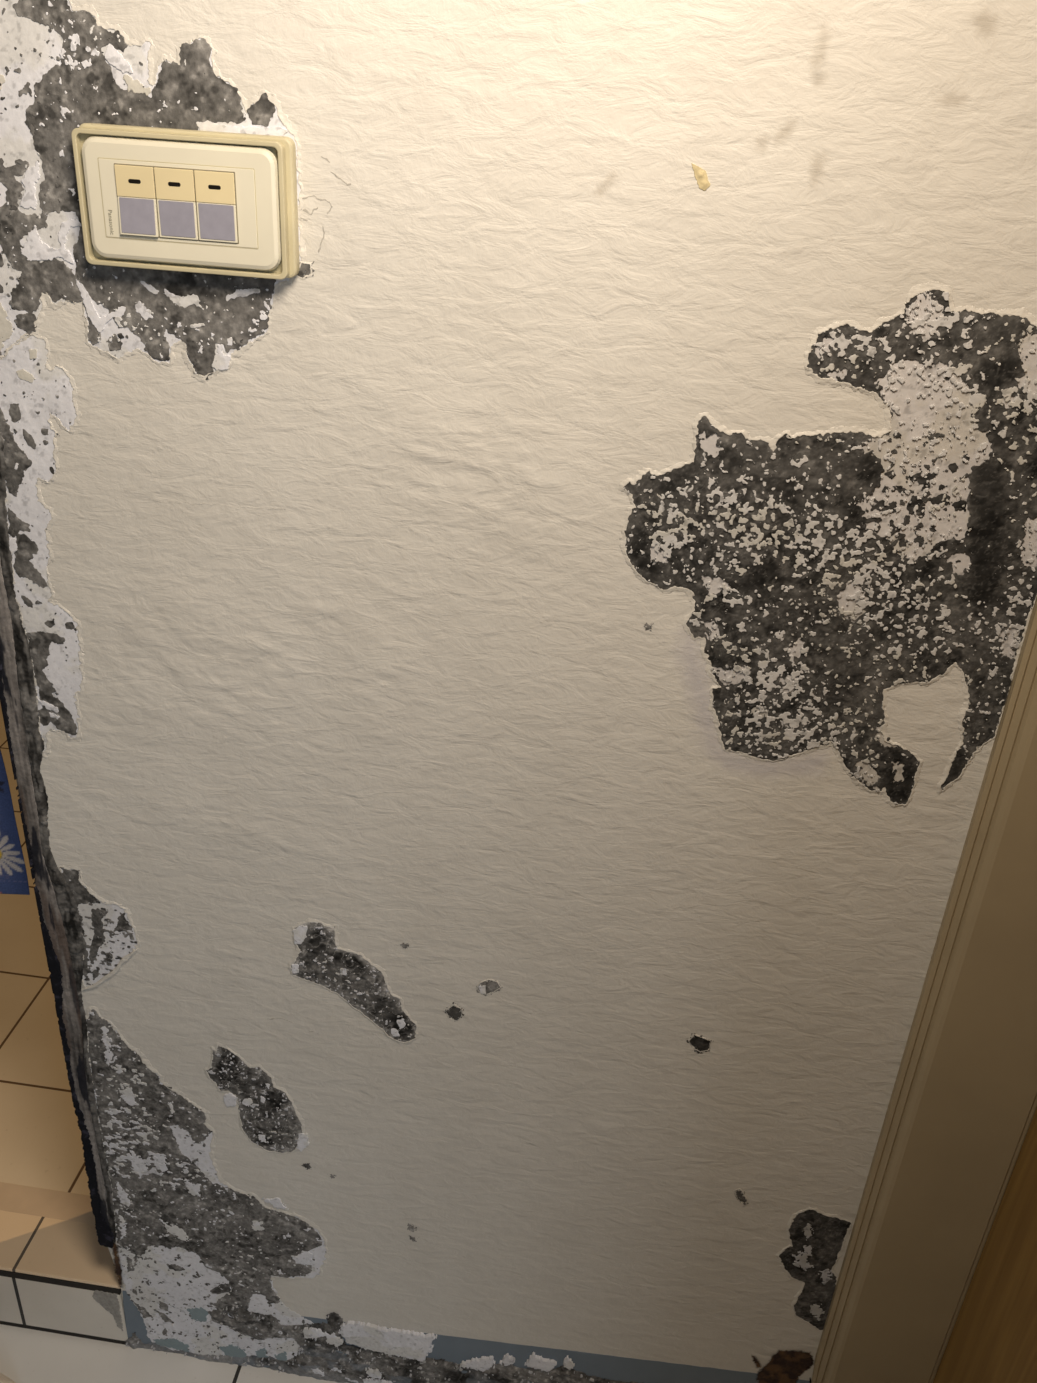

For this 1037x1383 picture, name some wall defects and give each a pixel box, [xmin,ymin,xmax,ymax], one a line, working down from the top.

spalling [618,281,1037,808]
peeling [0,0,638,1383]
peeling [687,1033,712,1054]
peeling [734,1188,749,1207]
spalling [775,1207,853,1331]
rust [752,1350,813,1383]